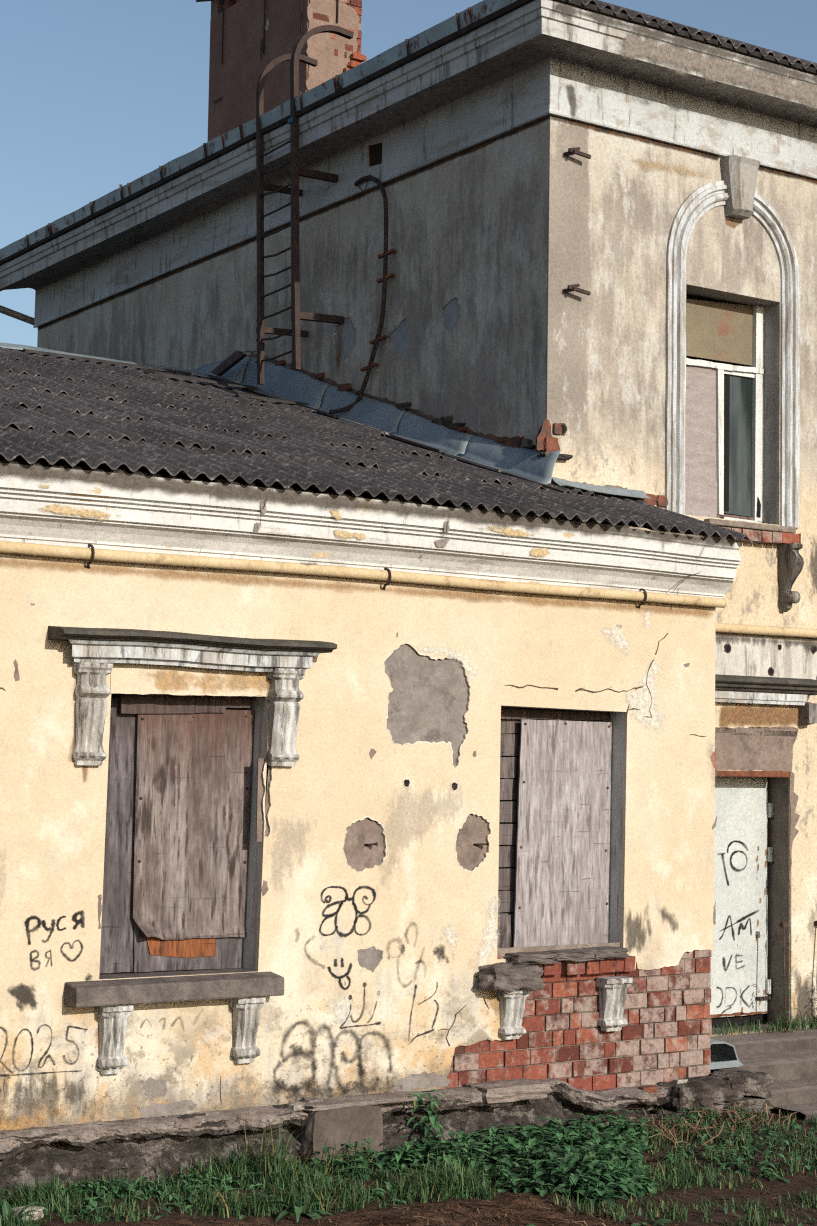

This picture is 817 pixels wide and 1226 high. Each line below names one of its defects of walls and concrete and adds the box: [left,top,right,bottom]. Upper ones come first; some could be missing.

flaking render [313,0,367,72]
crack [509,545,706,718]
flaking render [384,632,477,792]
flaking render [342,816,387,873]
flaking render [455,813,492,873]
flaking render [497,942,620,959]
flaking render [393,950,712,1091]
water stain [0,1076,84,1109]